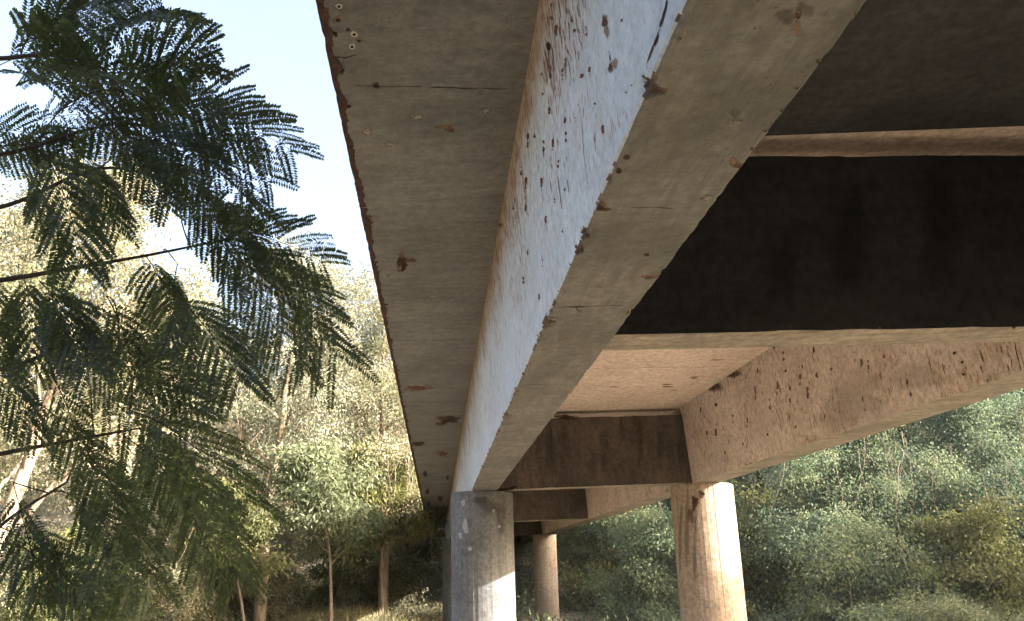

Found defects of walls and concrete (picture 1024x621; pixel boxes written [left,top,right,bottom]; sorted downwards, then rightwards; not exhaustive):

corrosion [541,1,591,81]
crack [333,55,505,90]
corrosion [505,117,576,213]
corrosion [316,0,424,509]
spalling [397,253,416,272]
corrosion [769,373,818,410]
spalling [436,416,459,426]